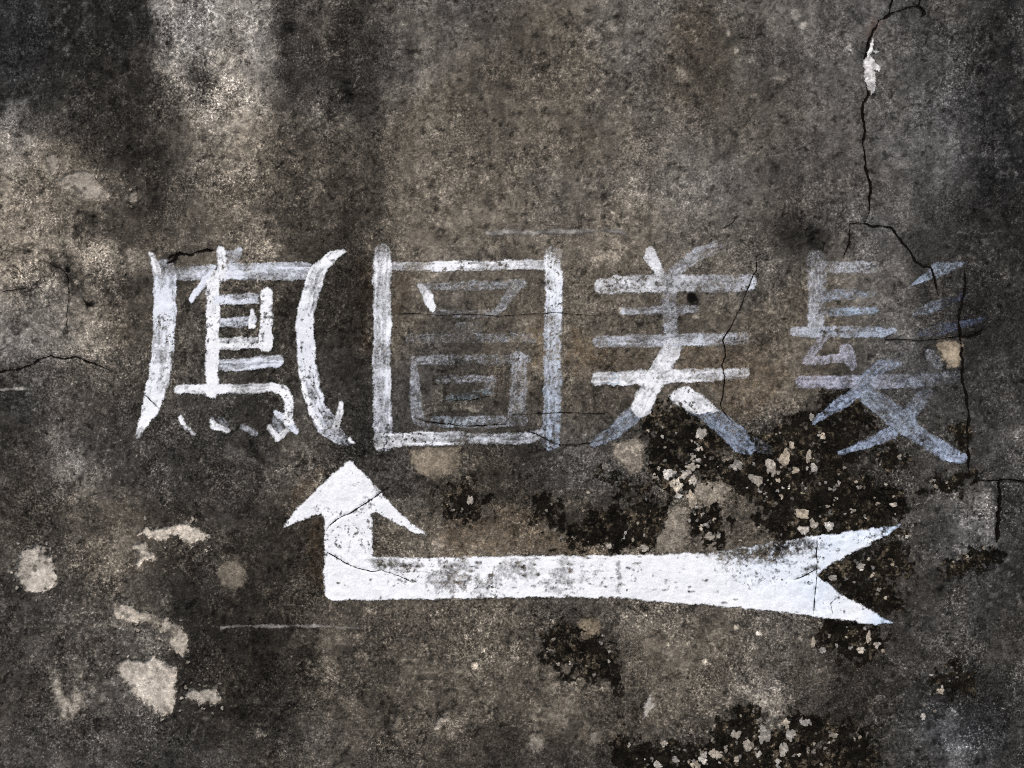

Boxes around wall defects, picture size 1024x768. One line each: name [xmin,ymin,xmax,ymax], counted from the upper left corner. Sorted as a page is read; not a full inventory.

crack [0,251,114,373]
water stain [0,0,388,472]
crack [843,0,1024,542]
spalling [10,542,61,602]
crack [326,486,411,582]
spalling [409,445,496,529]
peeling [526,378,985,672]
spalling [112,602,223,721]
spalling [526,733,544,753]
peeling [534,608,625,698]
spalling [643,694,655,719]
peeling [588,699,883,768]